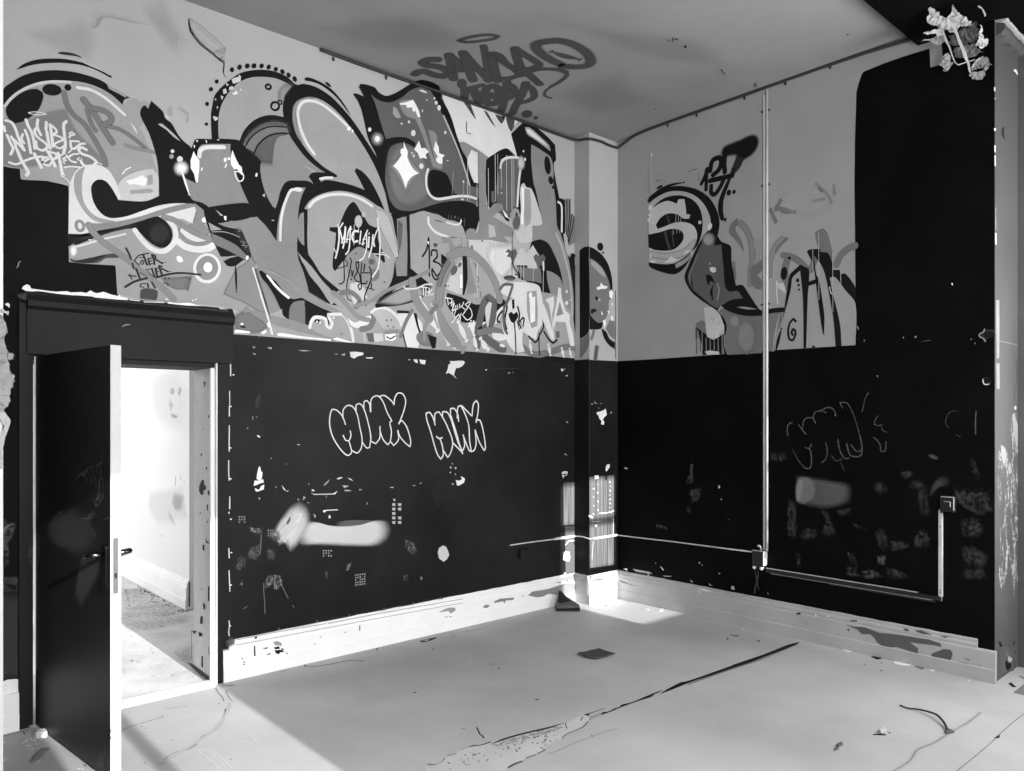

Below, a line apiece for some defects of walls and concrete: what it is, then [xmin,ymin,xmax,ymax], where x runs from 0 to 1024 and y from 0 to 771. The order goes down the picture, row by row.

peeling [446,361,465,379]
peeling [254,467,361,518]
peeling [998,413,1018,588]
peeling [835,620,980,666]
crack [548,642,799,754]